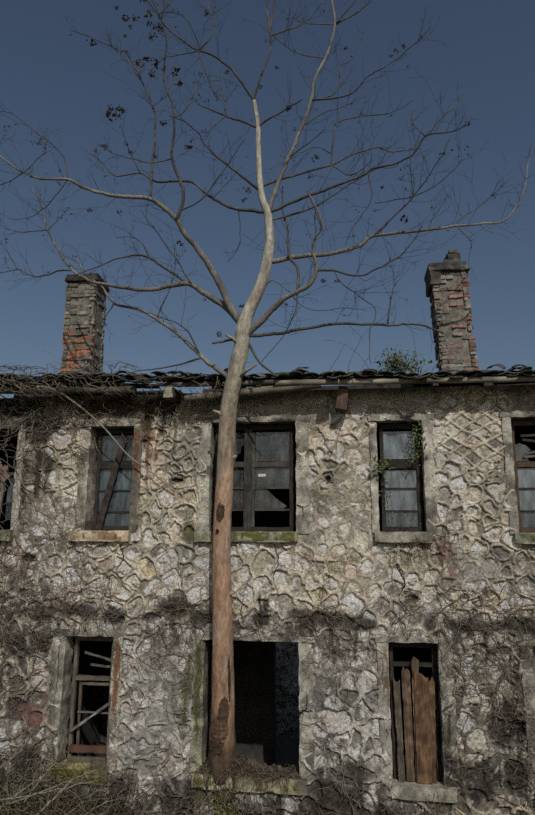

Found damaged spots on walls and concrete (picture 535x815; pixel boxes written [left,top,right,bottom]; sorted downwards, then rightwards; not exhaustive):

water stain [143,596,212,646]
water stain [252,595,270,627]
water stain [159,778,196,815]
water stain [226,794,283,815]
water stain [293,758,401,815]